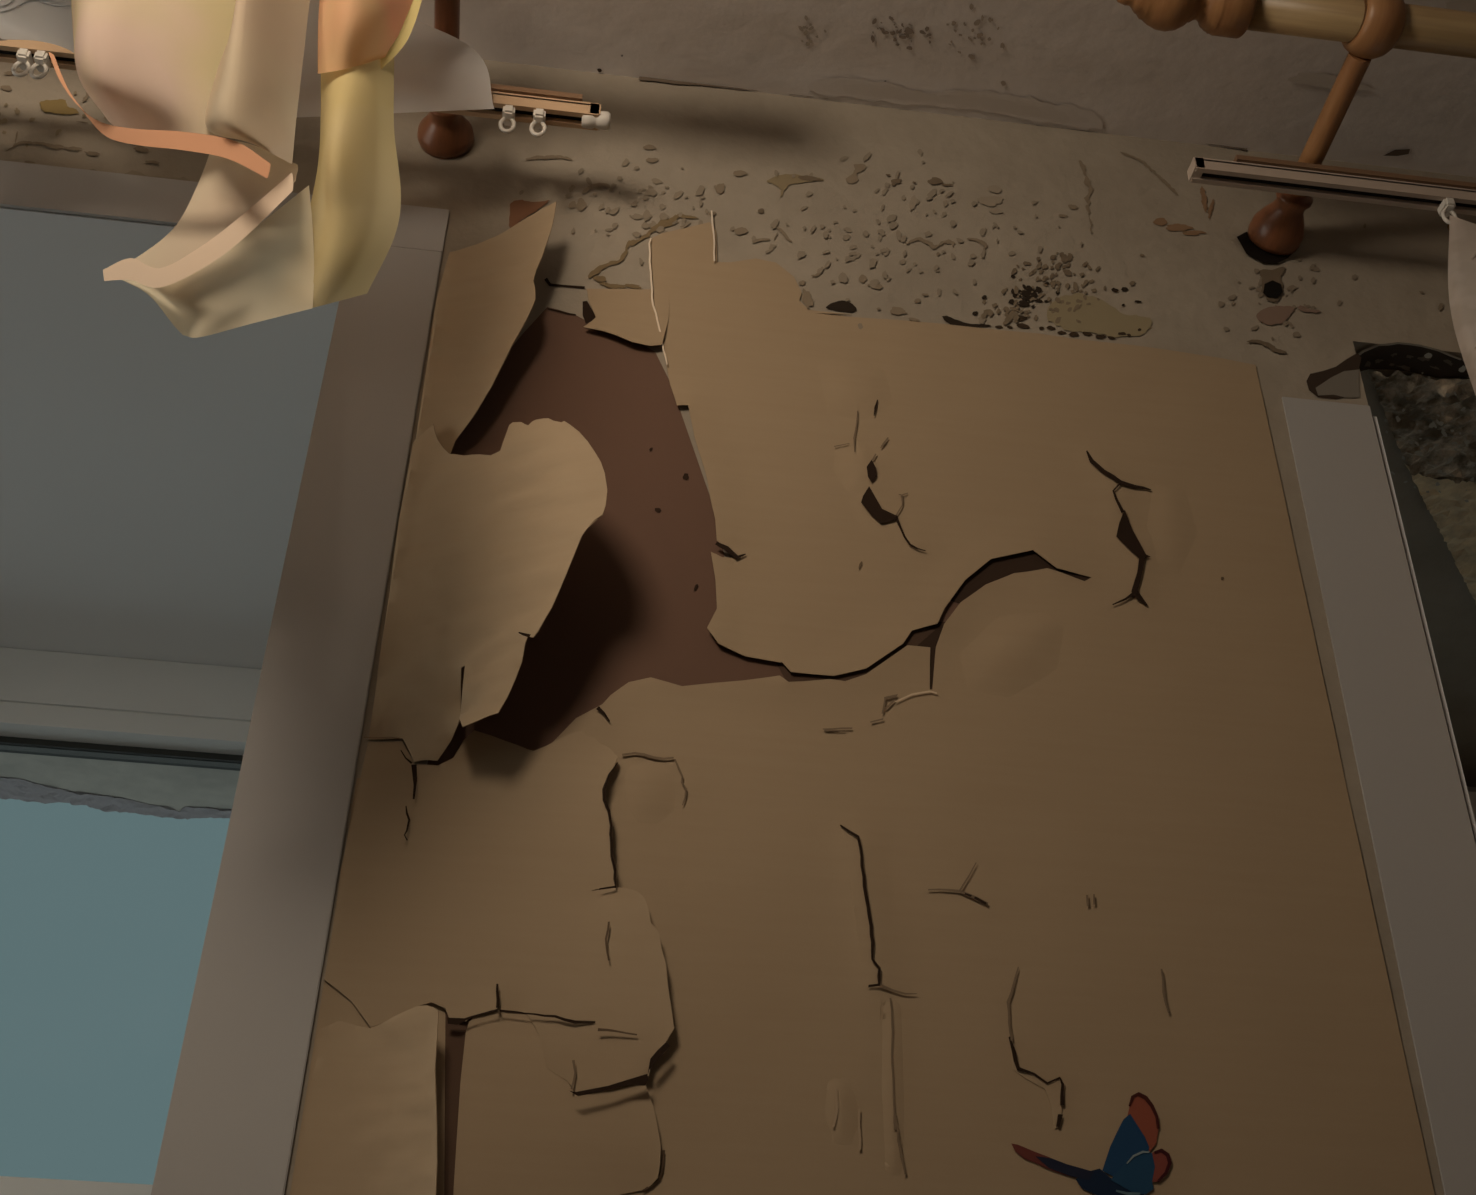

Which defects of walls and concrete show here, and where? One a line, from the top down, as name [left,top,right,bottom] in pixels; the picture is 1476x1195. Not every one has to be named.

damp [871,4,1005,60]
damp [526,144,748,289]
damp [730,149,1152,339]
crack [715,542,746,559]
crack [834,400,926,551]
crack [776,451,1151,731]
spalling [1306,342,1476,600]
peeling [291,202,674,1195]
crack [840,825,917,1175]
crack [1007,967,1064,1127]